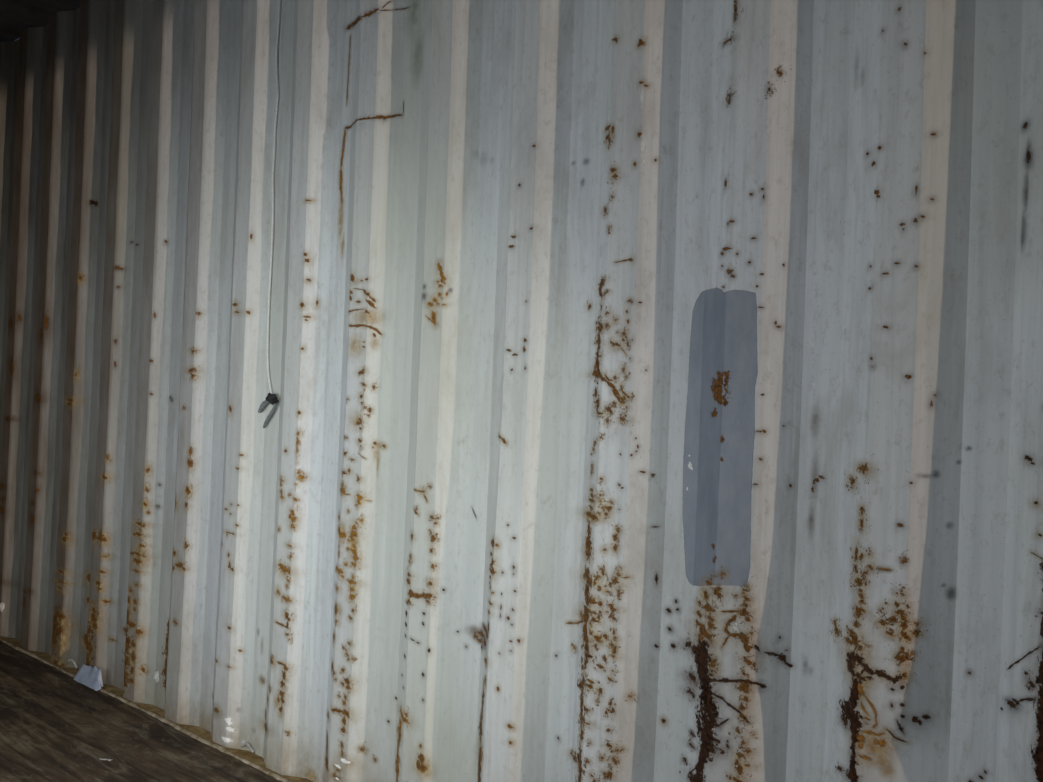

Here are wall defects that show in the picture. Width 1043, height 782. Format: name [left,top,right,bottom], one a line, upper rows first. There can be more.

rust [349,274,382,348]
rust [422,263,448,325]
rust [83,469,161,693]
rust [274,432,308,644]
rust [325,365,385,778]
rust [387,674,410,782]
rust [405,485,445,652]
rust [566,274,642,782]
rust [671,566,769,782]
rust [835,677,891,782]
rust [830,449,931,691]
rust [1007,650,1043,782]